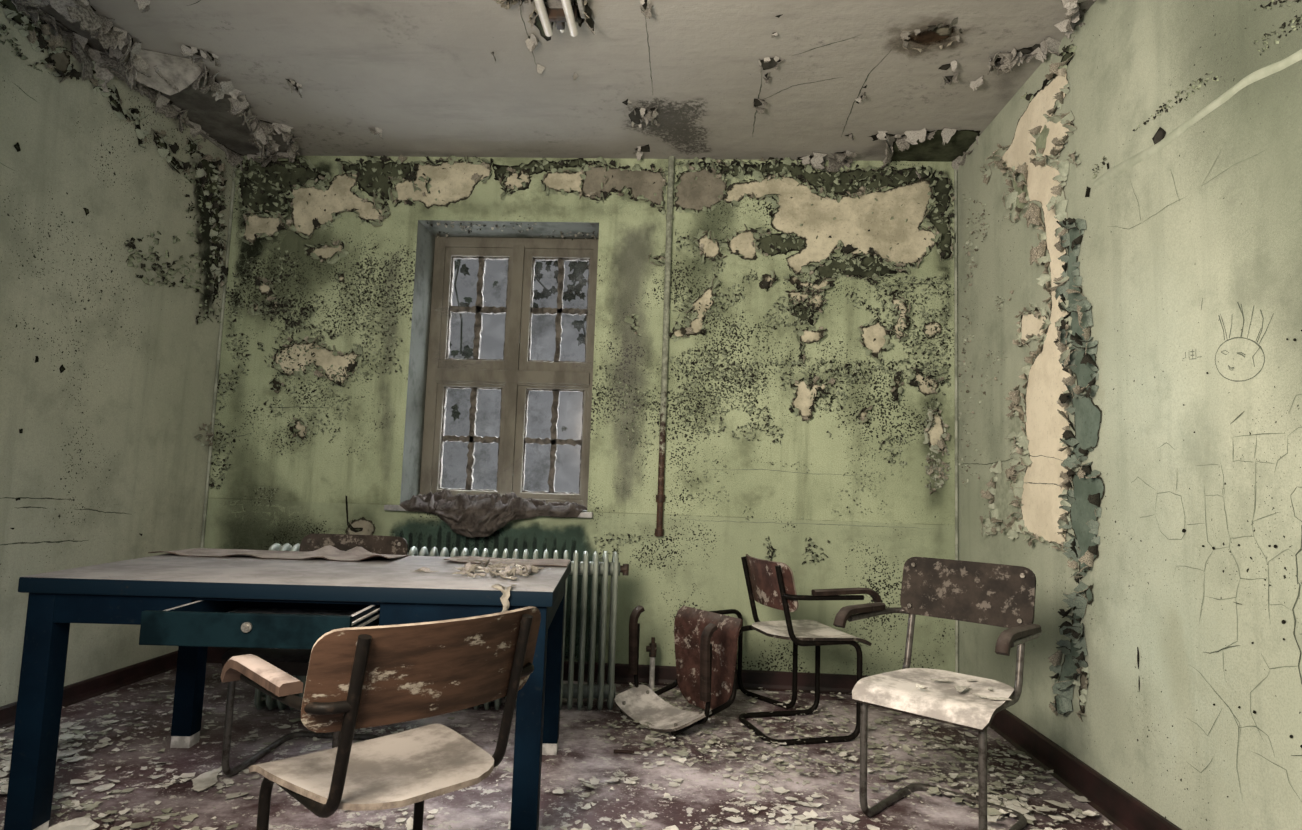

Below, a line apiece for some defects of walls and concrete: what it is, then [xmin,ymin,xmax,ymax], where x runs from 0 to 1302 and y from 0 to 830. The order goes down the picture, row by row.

peeling [0,0,1105,722]
leakage [616,233,648,491]
crack [1131,394,1302,802]